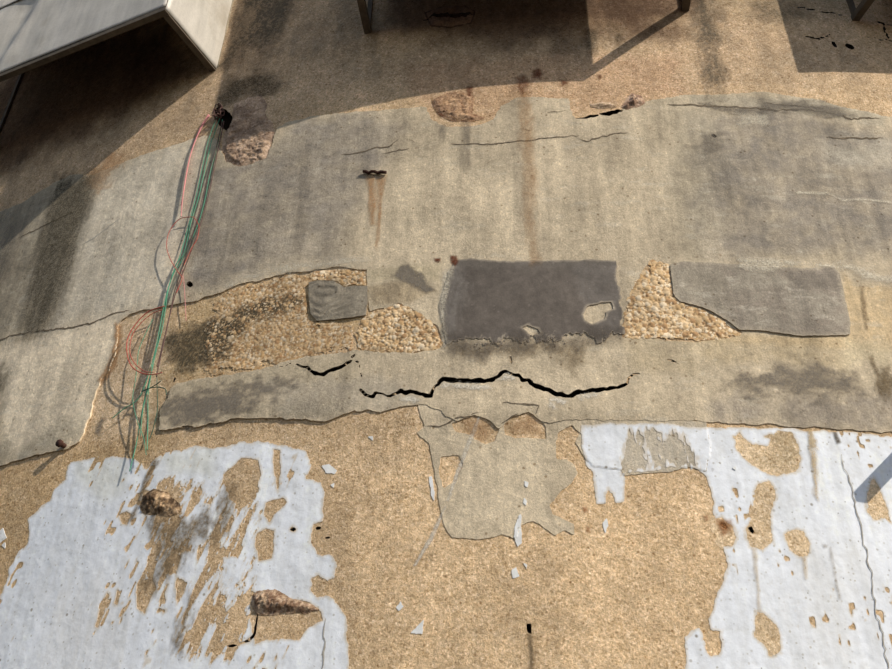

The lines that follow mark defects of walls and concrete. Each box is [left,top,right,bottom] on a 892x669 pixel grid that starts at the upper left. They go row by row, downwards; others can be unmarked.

spalling [221,95,275,167]
spalling [432,91,484,122]
crack [456,111,622,145]
spalling [200,268,443,376]
spalling [622,259,741,341]
peeling [0,440,349,669]
peeling [580,422,892,669]